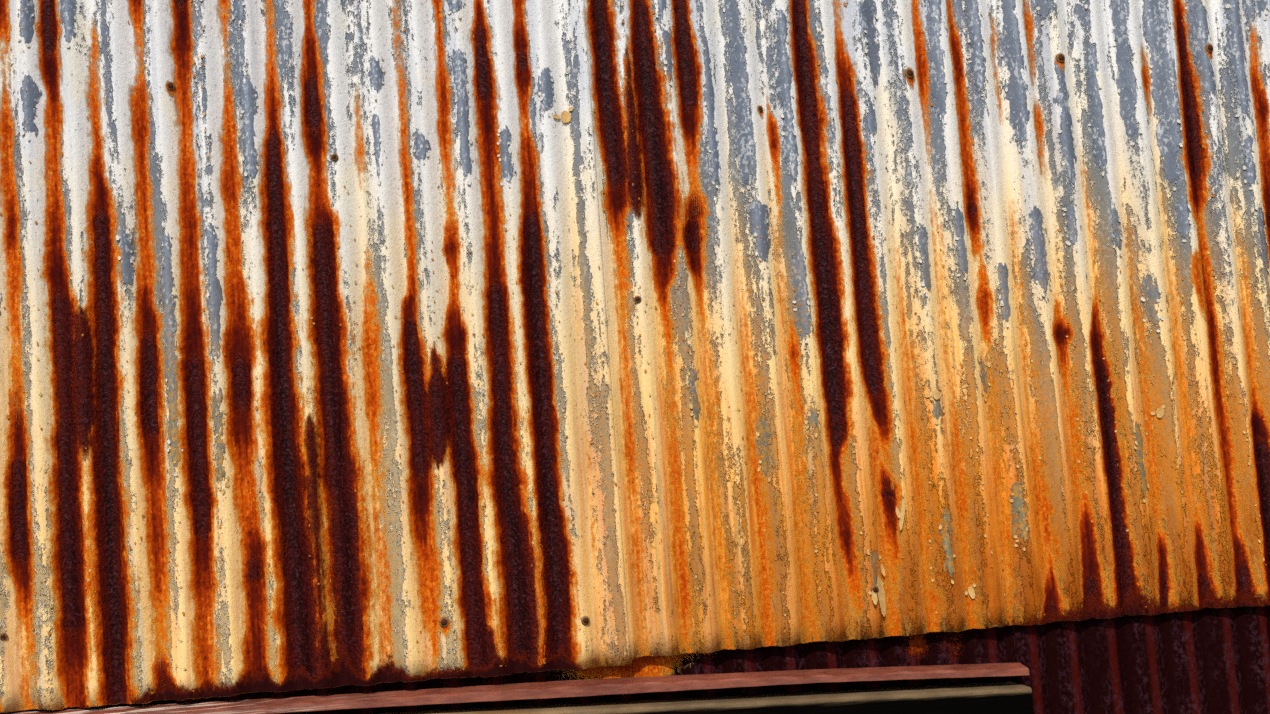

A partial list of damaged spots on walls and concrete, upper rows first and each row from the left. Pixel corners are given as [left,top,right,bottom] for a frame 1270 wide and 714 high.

peeling [20,71,42,141]
rust [0,0,740,710]
peeling [703,0,771,269]
rust [740,283,780,646]
rust [757,103,824,643]
peeling [856,0,882,141]
rust [789,0,984,660]
peeling [965,0,1030,152]
peeling [1026,61,1078,314]
rust [946,0,1270,714]
peeling [1109,0,1192,340]
peeling [1185,0,1269,190]